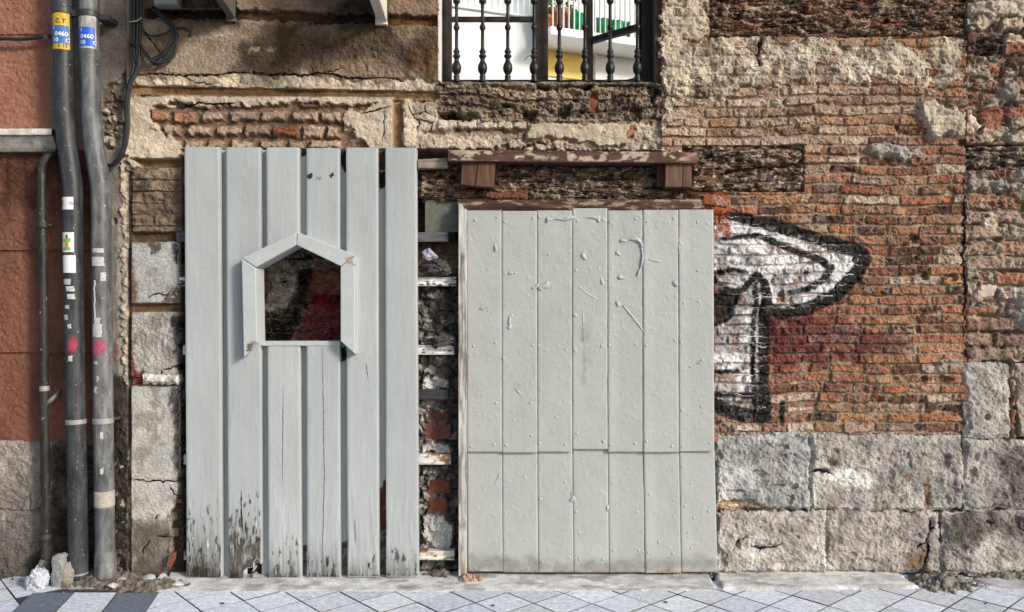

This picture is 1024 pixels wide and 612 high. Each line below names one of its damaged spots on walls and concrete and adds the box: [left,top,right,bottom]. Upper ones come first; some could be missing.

crack [137,28,405,108]
flaking render [151,99,385,171]
crack [132,479,179,496]
crack [917,520,934,569]